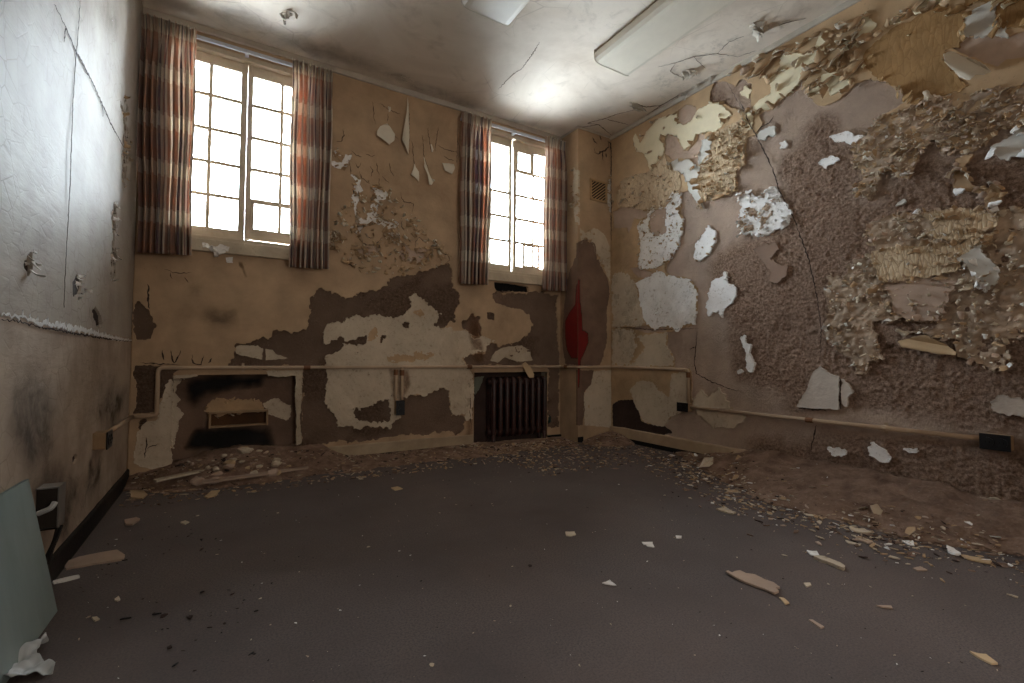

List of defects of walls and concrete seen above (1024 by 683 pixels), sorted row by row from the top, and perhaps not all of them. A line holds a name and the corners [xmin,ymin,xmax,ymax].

crack [1,4,132,342]
peeling [133,365,198,469]
flaking render [202,147,560,446]
peeling [377,99,435,185]
crack [585,36,822,356]
flaking render [569,0,1024,502]